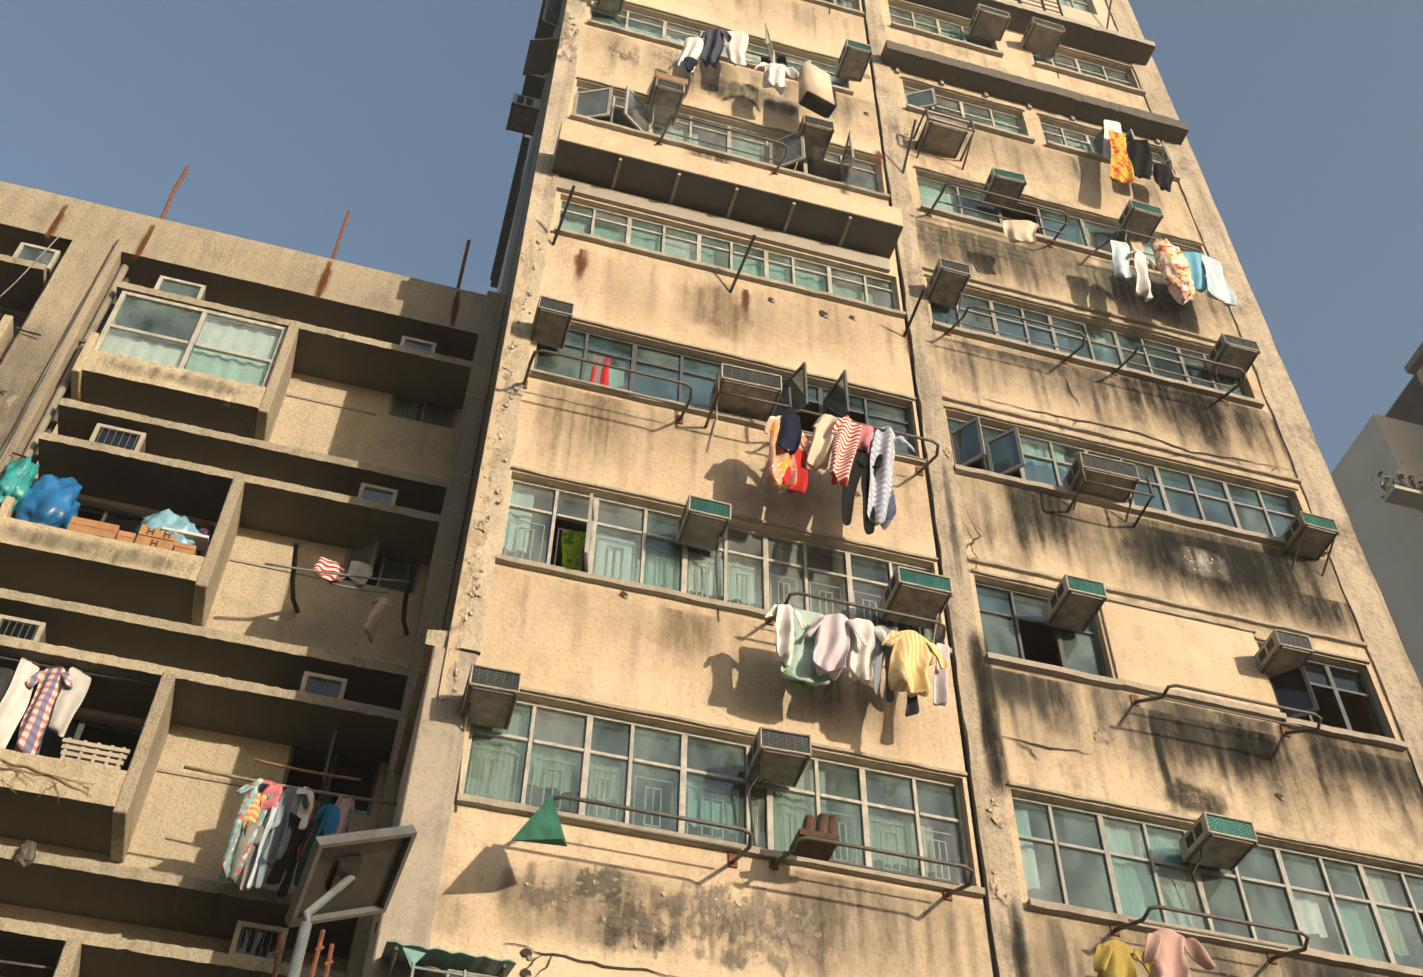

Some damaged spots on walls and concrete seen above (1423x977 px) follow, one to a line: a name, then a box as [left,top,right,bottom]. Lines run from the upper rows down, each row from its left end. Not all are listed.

rust [45,205,68,237]
rust [136,226,155,256]
leakage [924,225,1036,273]
rust [316,261,332,296]
rust [450,292,460,326]
leakage [1092,261,1181,313]
leakage [1121,376,1279,449]
leakage [1004,484,1101,543]
leakage [1125,517,1349,625]
leakage [1095,687,1423,815]
leakage [589,872,642,945]
crack [507,943,677,977]